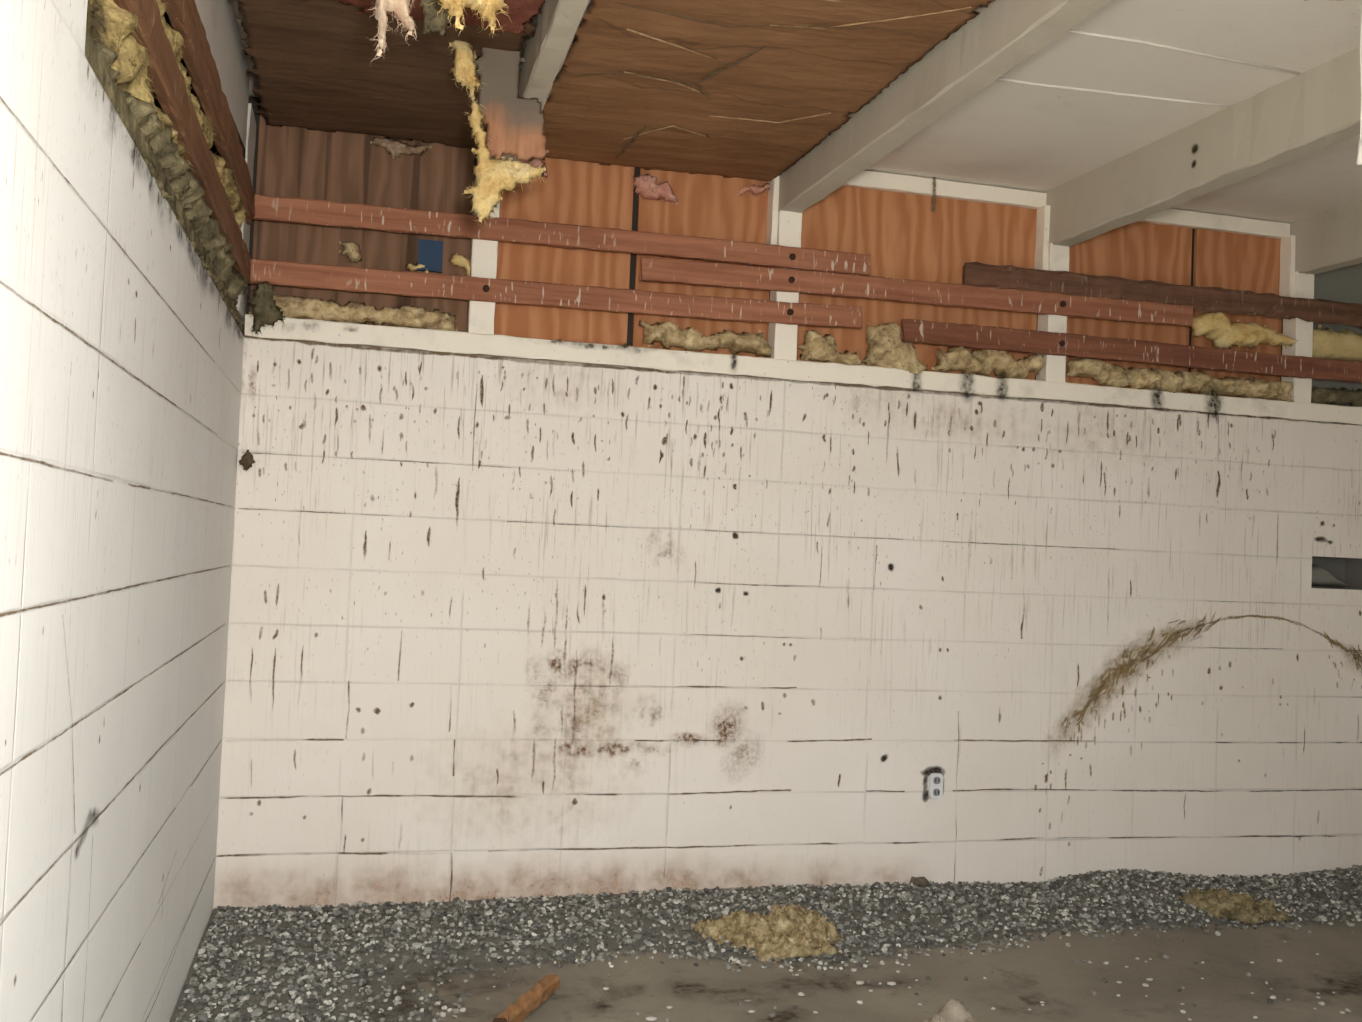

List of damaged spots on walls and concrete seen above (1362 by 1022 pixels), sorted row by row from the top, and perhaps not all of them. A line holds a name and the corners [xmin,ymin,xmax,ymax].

damp [551,587,598,724]
damp [718,719,736,743]
damp [561,744,629,755]